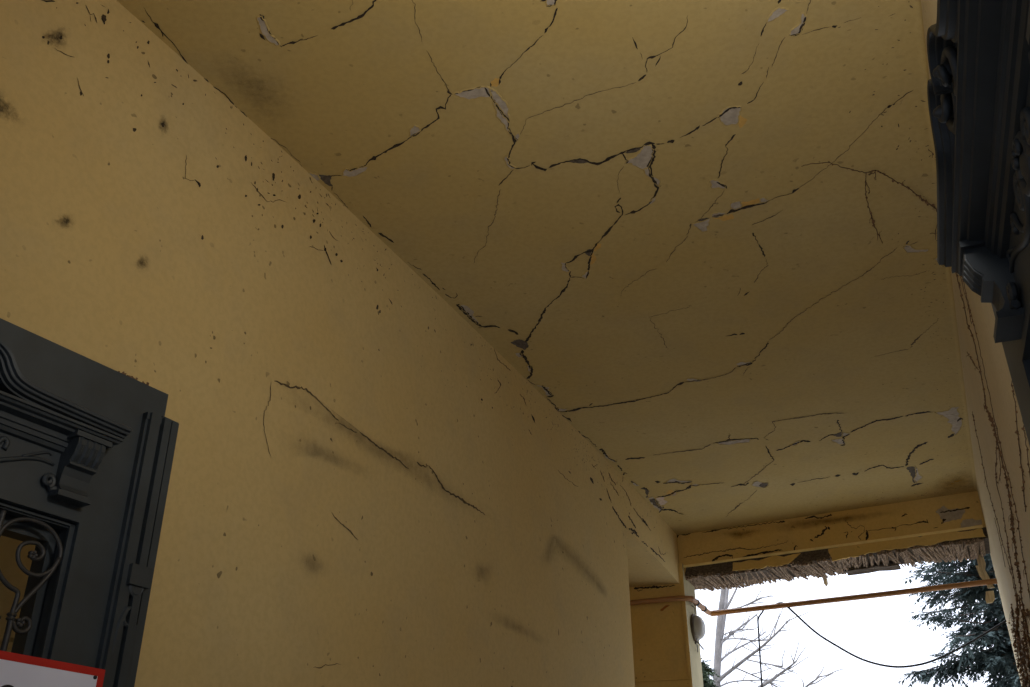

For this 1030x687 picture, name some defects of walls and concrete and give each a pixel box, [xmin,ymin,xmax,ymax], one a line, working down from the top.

crack [142,10,247,117]
crack [256,0,937,591]